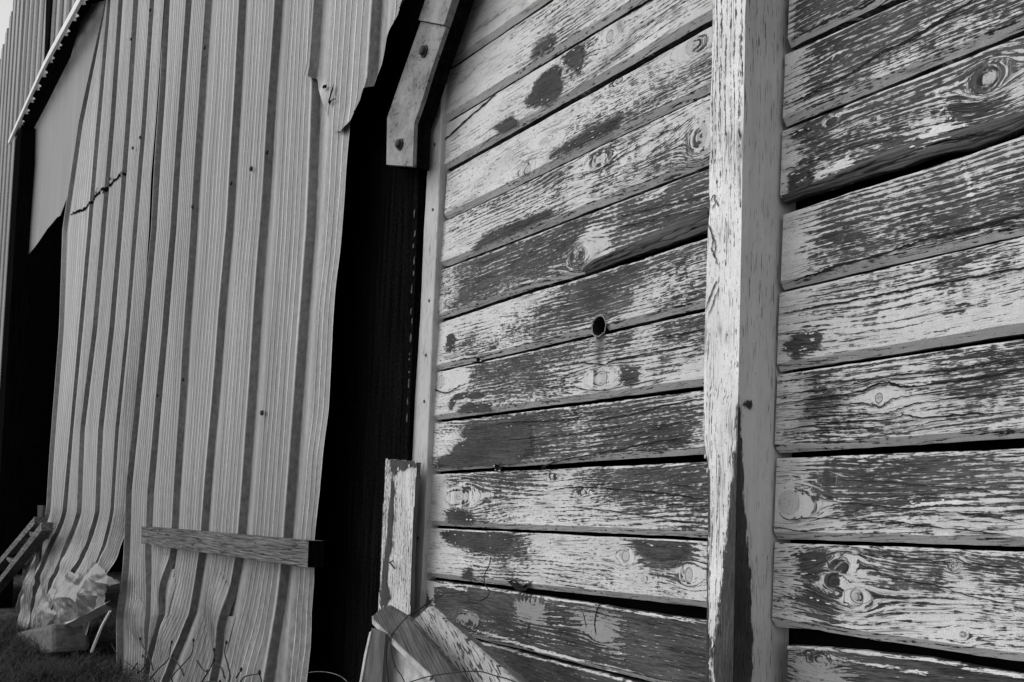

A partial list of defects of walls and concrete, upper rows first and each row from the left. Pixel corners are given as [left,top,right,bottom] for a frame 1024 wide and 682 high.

peeling [493,32,587,134]
spalling [780,89,1024,206]
peeling [470,206,553,252]
spalling [583,195,719,274]
peeling [782,328,825,361]
peeling [437,391,534,471]
peeling [440,507,514,555]
peeling [704,402,754,682]
peeling [904,494,975,510]
peeling [427,567,474,605]
peeling [453,580,630,672]
peeling [787,647,928,682]